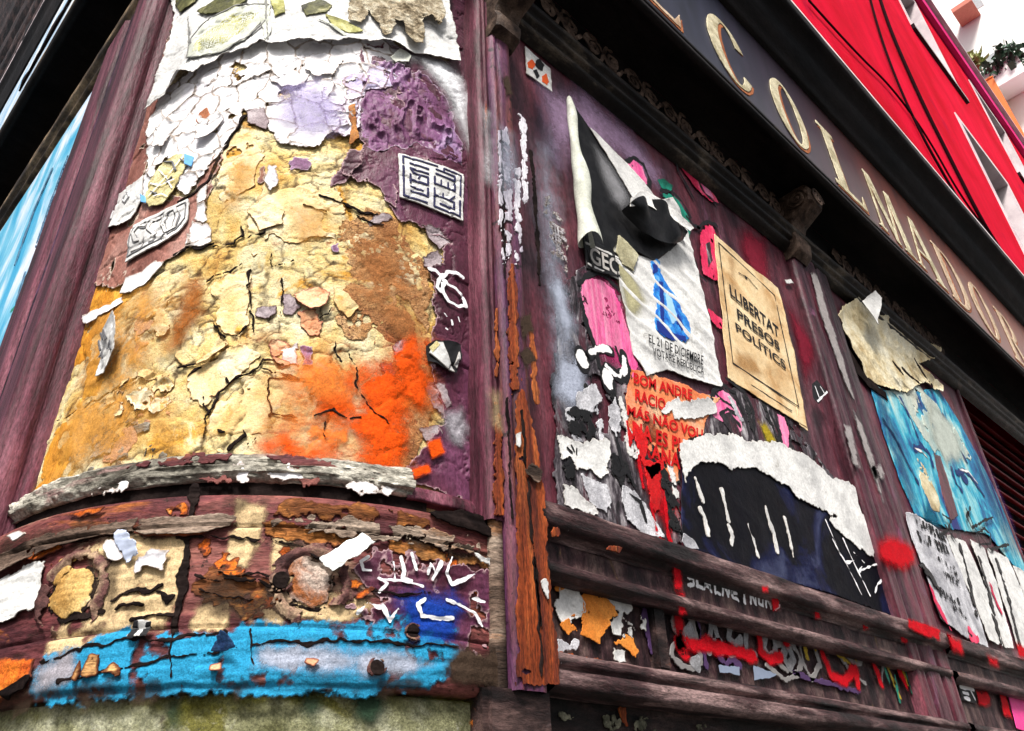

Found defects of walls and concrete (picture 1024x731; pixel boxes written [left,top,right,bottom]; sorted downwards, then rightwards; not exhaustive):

crack [500,130,541,286]
peeling [69,0,470,556]
crack [202,341,388,451]
peeling [485,101,574,686]
peeling [590,405,604,441]
peeling [609,387,634,457]
peeling [657,452,679,532]
peeling [102,539,123,561]
peeling [133,548,170,595]
peeling [191,538,275,607]
crack [0,397,544,685]
peeling [209,630,237,671]